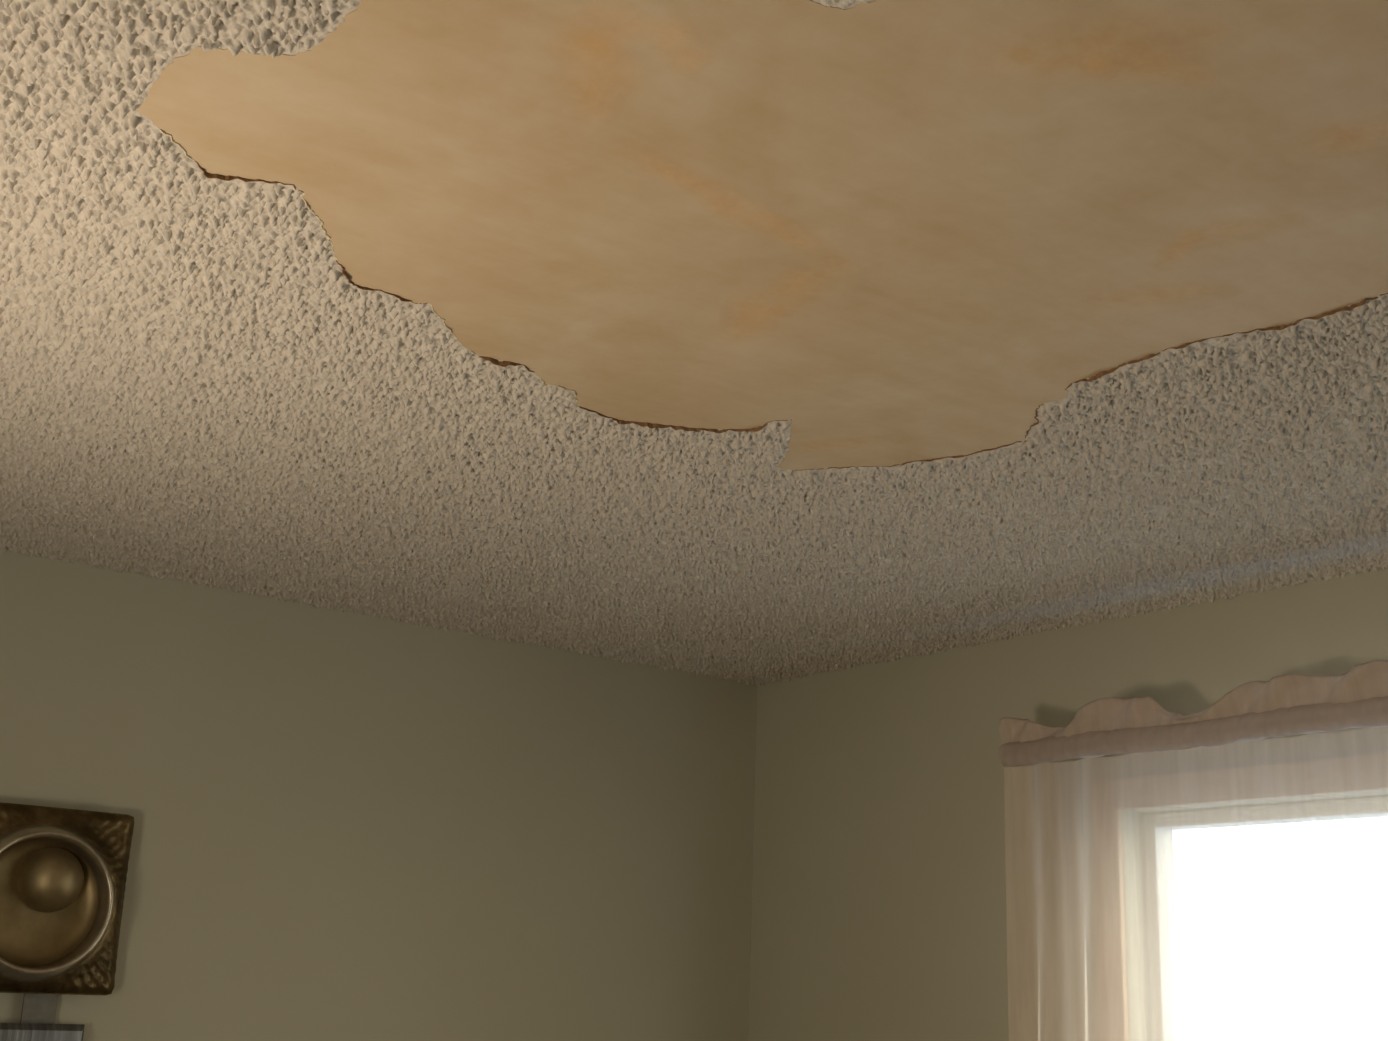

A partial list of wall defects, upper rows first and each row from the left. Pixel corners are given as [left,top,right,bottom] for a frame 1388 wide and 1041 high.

peeling [136,0,1388,471]